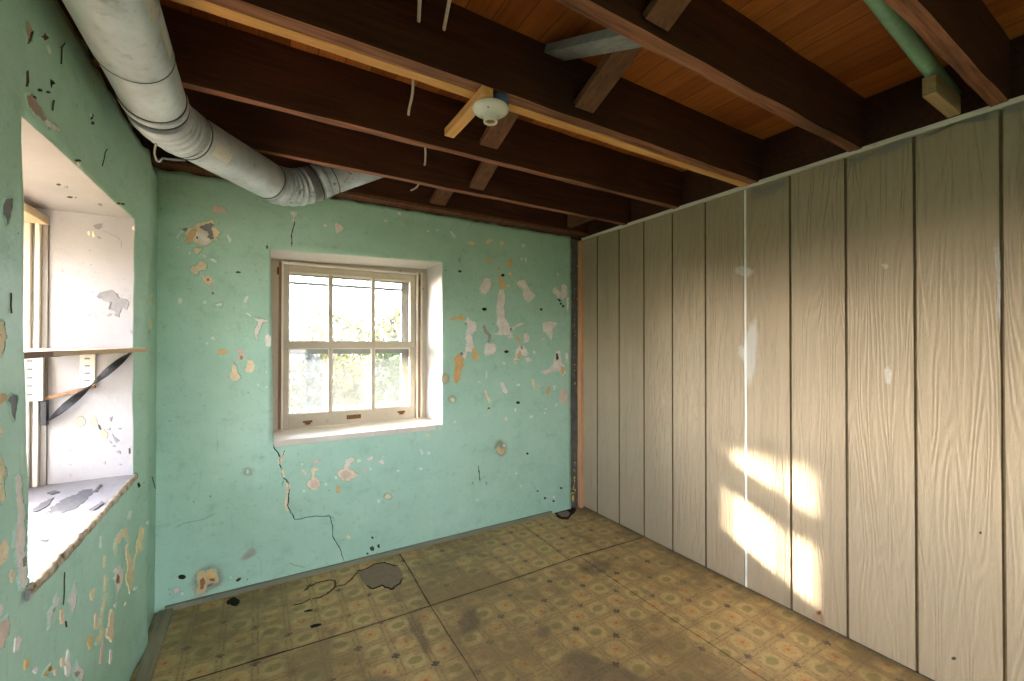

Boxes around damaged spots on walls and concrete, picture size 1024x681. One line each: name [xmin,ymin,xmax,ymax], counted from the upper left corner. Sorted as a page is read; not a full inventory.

peeling [24,70,61,134]
peeling [91,290,129,318]
peeling [176,204,232,309]
peeling [427,229,569,421]
peeling [0,456,104,592]
crack [273,444,344,560]
peeling [301,456,384,493]
peeling [46,510,149,664]
flaking render [172,564,241,598]